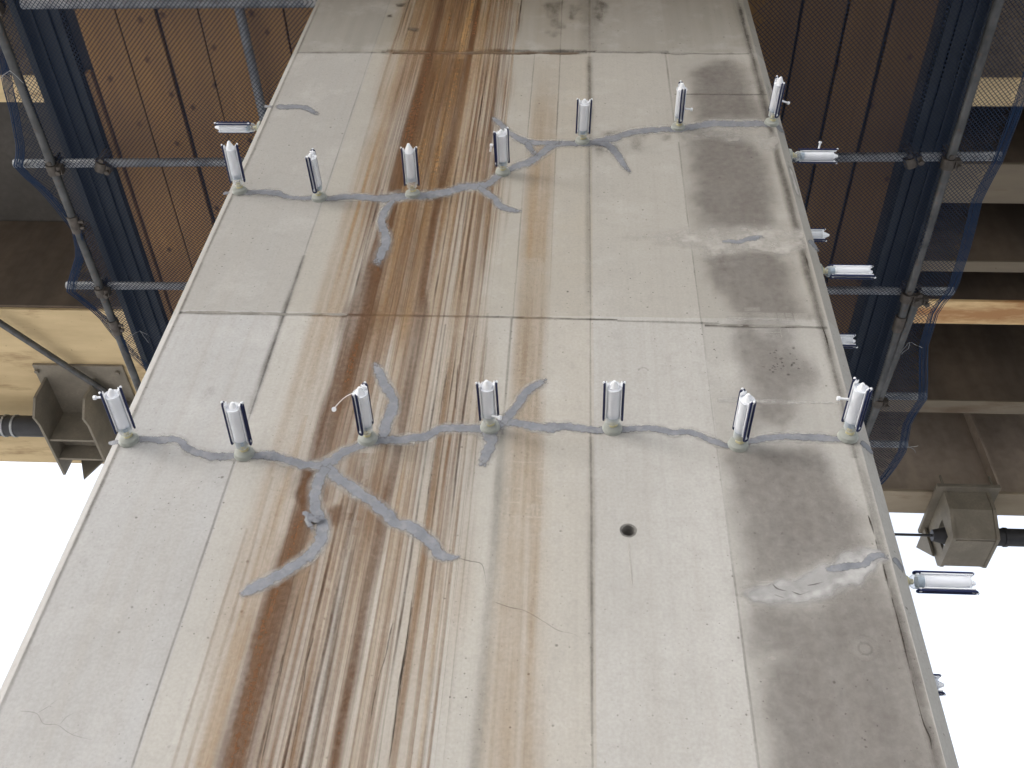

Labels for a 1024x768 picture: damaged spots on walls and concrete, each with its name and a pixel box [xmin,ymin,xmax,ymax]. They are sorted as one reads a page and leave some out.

crack [264,104,320,115]
crack [223,117,784,265]
leakage [659,189,803,271]
rust [221,0,505,768]
crack [108,362,873,597]
spalling [748,549,904,603]